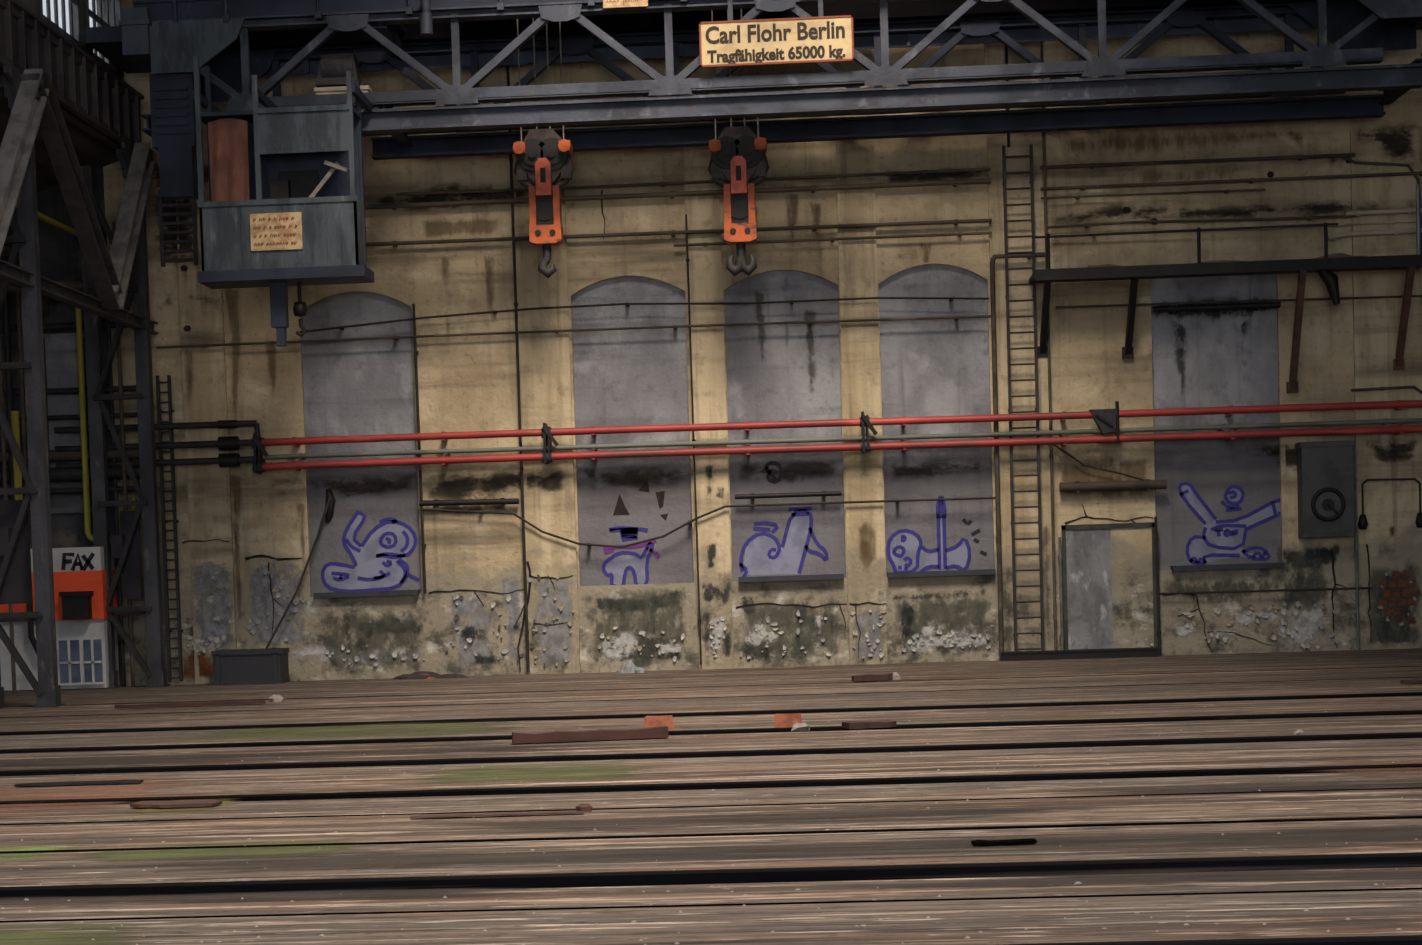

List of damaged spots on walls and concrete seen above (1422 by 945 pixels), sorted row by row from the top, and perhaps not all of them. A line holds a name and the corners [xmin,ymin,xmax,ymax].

water stain [707,544,716,567]
peeling [185,559,425,667]
water stain [325,615,422,666]
peeling [445,574,575,667]
water stain [596,592,683,661]
peeling [709,616,727,657]
water stain [703,584,834,660]
peeling [740,610,831,659]
peeling [850,609,886,659]
water stain [894,590,987,651]
peeling [902,625,991,652]
peeling [1176,601,1335,649]